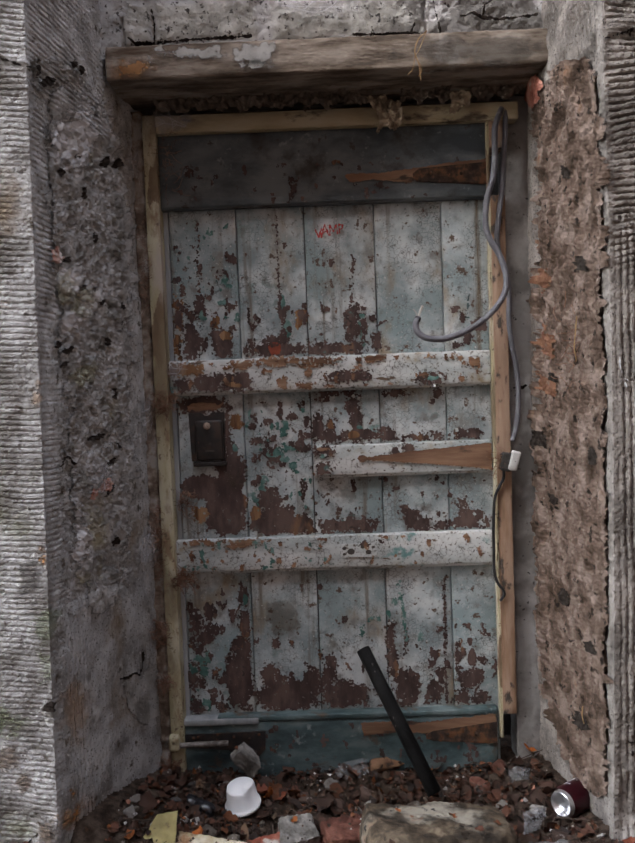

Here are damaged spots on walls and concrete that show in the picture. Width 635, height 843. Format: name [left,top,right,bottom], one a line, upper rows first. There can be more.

peeling [168,215,493,572]
peeling [186,564,383,714]
peeling [359,575,497,707]
crack [120,652,145,680]
peeling [348,721,396,736]
peeling [407,713,497,742]
spalling [230,742,261,779]